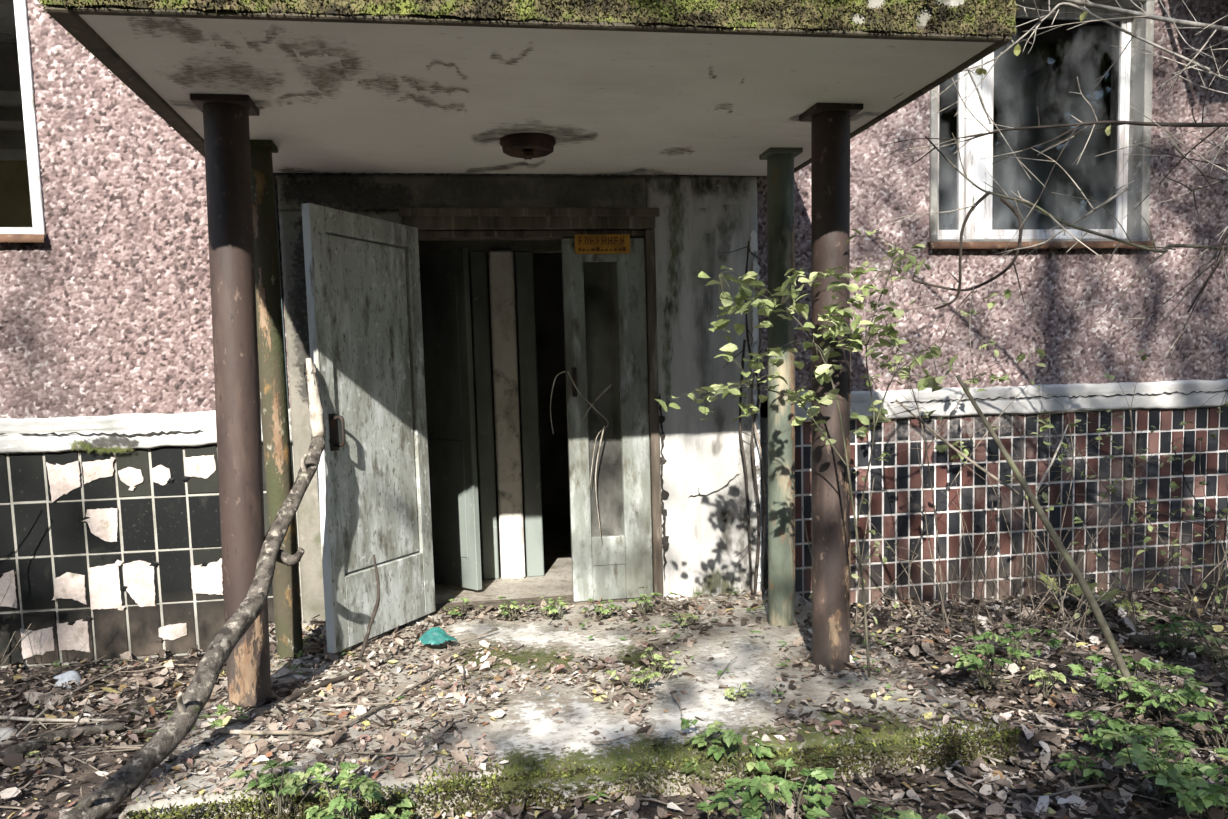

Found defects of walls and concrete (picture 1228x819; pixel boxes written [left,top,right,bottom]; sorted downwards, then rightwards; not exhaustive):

corrosion [257,266,271,357]
spalling [46,434,216,503]
corrosion [272,383,284,474]
damp [713,410,724,453]
spalling [0,570,18,608]
spalling [20,560,159,659]
spalling [82,508,118,542]
spalling [154,623,187,642]
spalling [191,558,223,595]
corrosion [228,615,263,705]
damp [722,437,756,592]
corrosion [828,439,851,659]